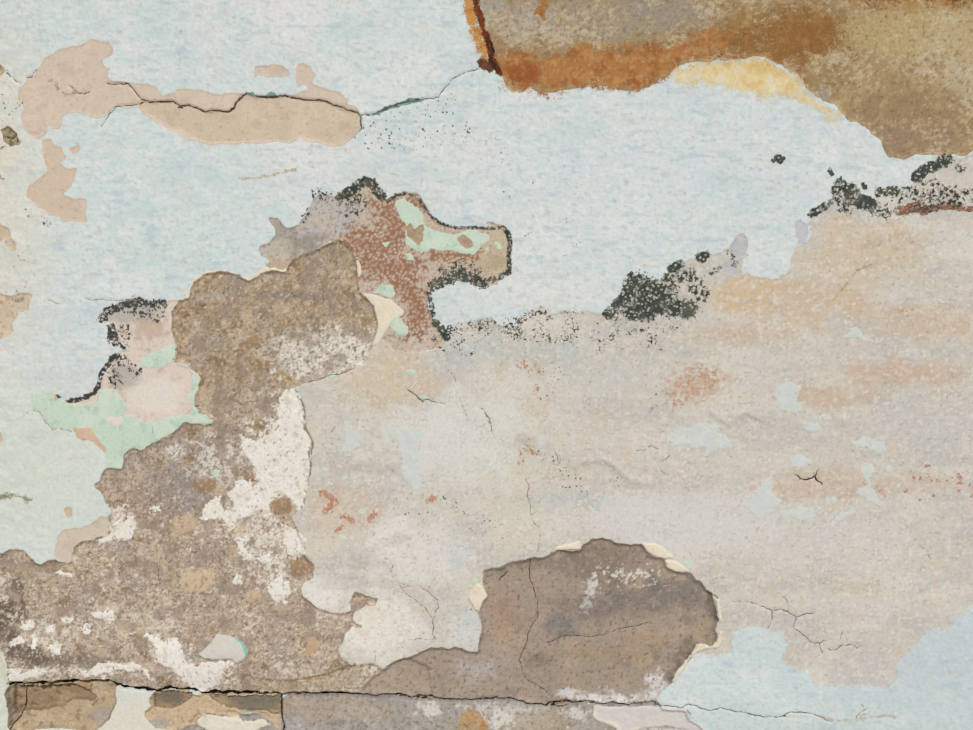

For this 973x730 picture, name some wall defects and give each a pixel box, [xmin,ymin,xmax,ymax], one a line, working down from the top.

peeling [1,39,425,223]
crack [68,66,482,130]
rust [453,0,862,130]
damp [807,152,973,220]
damp [56,294,168,403]
peeling [259,0,973,704]
spalling [0,240,706,730]
crack [9,481,869,730]